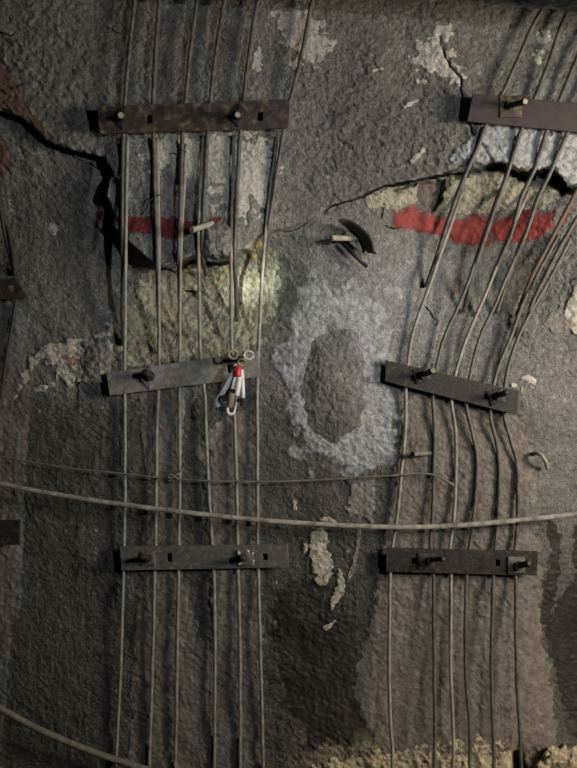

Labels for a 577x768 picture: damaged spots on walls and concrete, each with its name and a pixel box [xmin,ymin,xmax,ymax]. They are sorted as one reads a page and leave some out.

corrosion [0,58,57,143]
crack [0,107,114,245]
crack [324,173,464,229]
crack [439,35,575,195]
spalling [115,241,283,368]
spalling [544,278,577,336]
peeling [303,516,346,610]
water stain [125,267,577,768]